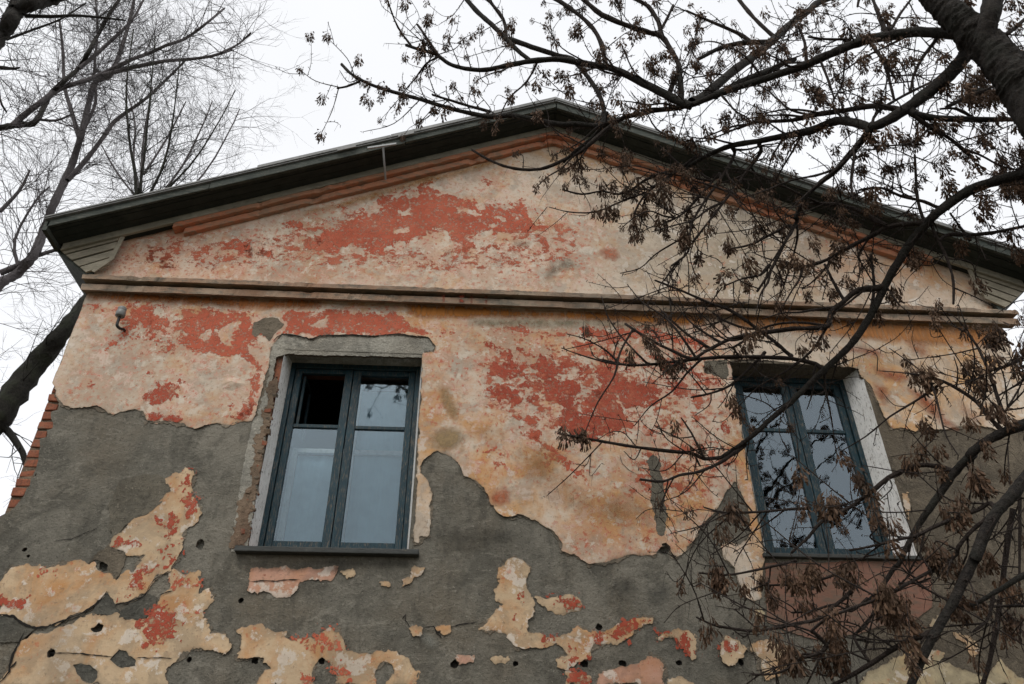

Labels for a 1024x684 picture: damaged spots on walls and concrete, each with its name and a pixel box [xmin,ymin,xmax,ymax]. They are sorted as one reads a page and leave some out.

peeling [123,180,577,271]
spalling [0,300,1024,684]